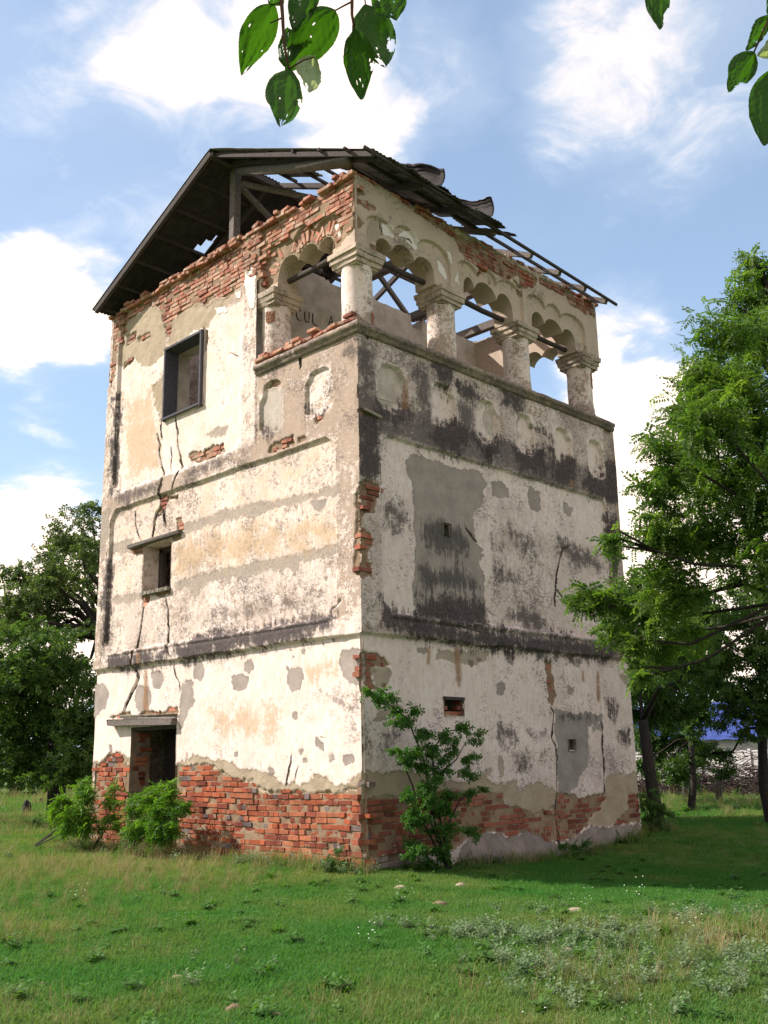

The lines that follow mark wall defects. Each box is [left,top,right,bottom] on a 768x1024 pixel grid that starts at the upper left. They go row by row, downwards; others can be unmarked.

spalling [109,177,383,388]
crack [126,602,181,709]
crack [135,417,183,540]
water stain [98,553,338,678]
spalling [339,647,392,692]
spalling [352,479,384,579]
water stain [342,337,619,537]
water stain [377,519,623,666]
crack [545,546,568,629]
spalling [90,744,131,847]
spalling [174,659,641,871]
crack [551,708,561,851]